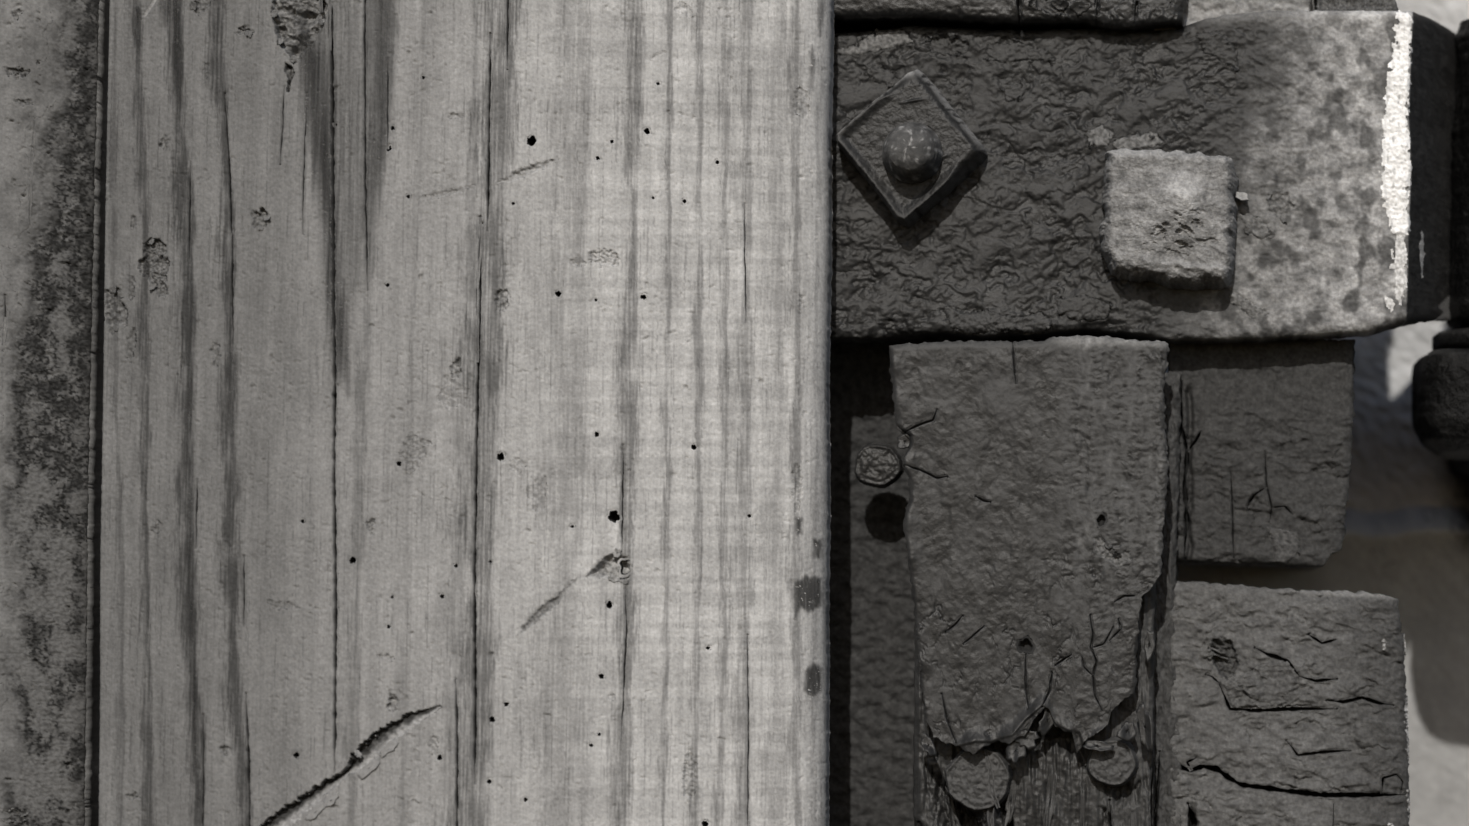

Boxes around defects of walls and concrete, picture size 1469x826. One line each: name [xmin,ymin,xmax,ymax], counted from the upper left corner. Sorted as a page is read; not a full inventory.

peeling [889,294,1170,764]
crack [199,715,207,826]
crack [244,693,252,826]
crack [1106,800,1114,826]
crack [1148,634,1405,826]